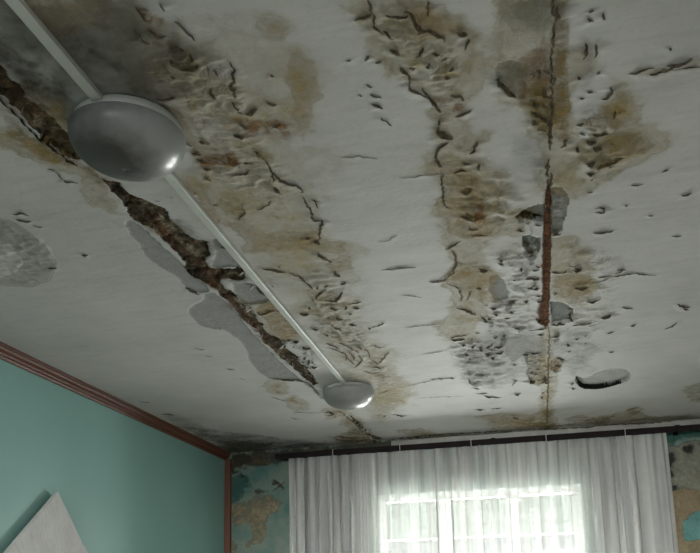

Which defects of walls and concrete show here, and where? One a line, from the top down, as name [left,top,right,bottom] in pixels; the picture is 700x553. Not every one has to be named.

damp [44,0,170,97]
crack [133,4,276,140]
crack [0,99,78,183]
spalling [102,179,324,399]
crack [230,151,331,263]
crack [263,266,311,288]
peeling [300,271,360,331]
peeling [482,275,515,328]
crack [325,0,682,444]
spalling [519,233,541,266]
spalling [515,187,569,234]
corrosion [538,179,552,329]